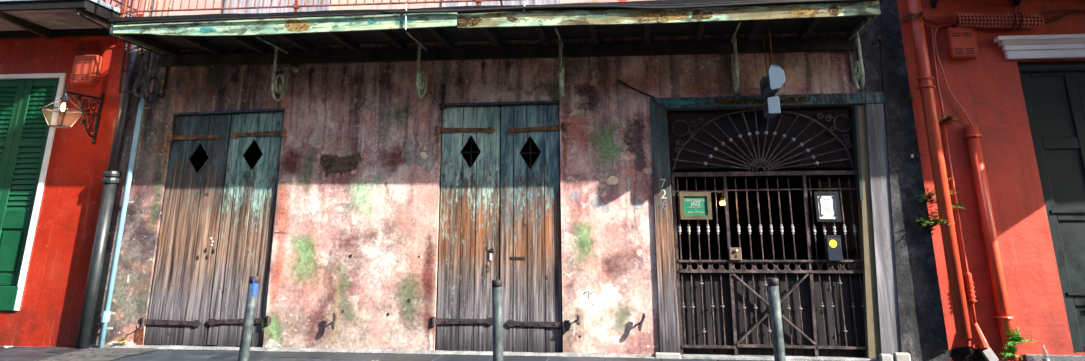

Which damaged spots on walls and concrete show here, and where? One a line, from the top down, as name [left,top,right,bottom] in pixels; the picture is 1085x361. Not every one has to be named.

spalling [317,150,362,177]